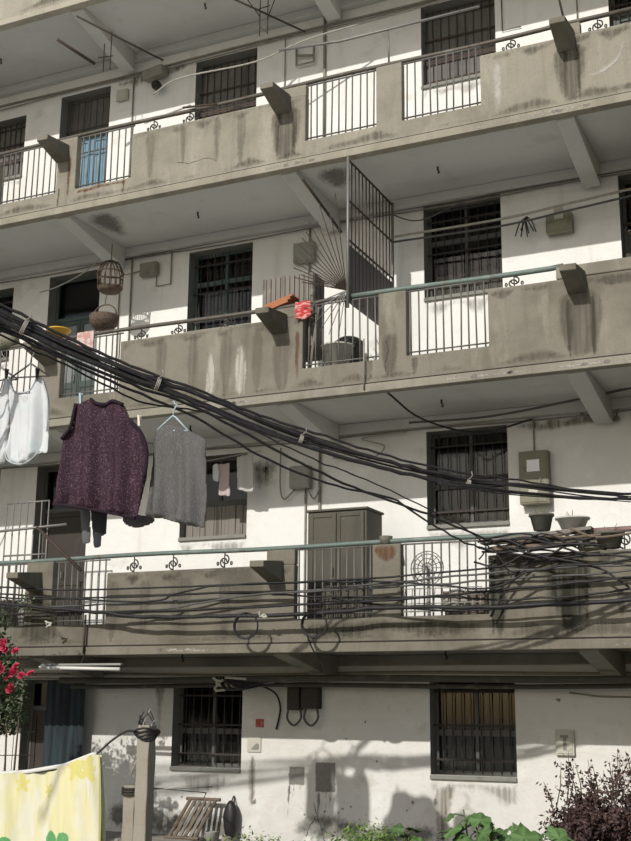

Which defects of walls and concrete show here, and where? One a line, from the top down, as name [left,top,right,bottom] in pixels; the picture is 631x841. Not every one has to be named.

damp [561,293,596,353]
damp [205,354,214,396]
damp [235,346,247,394]
damp [490,562,505,623]
damp [548,561,588,629]